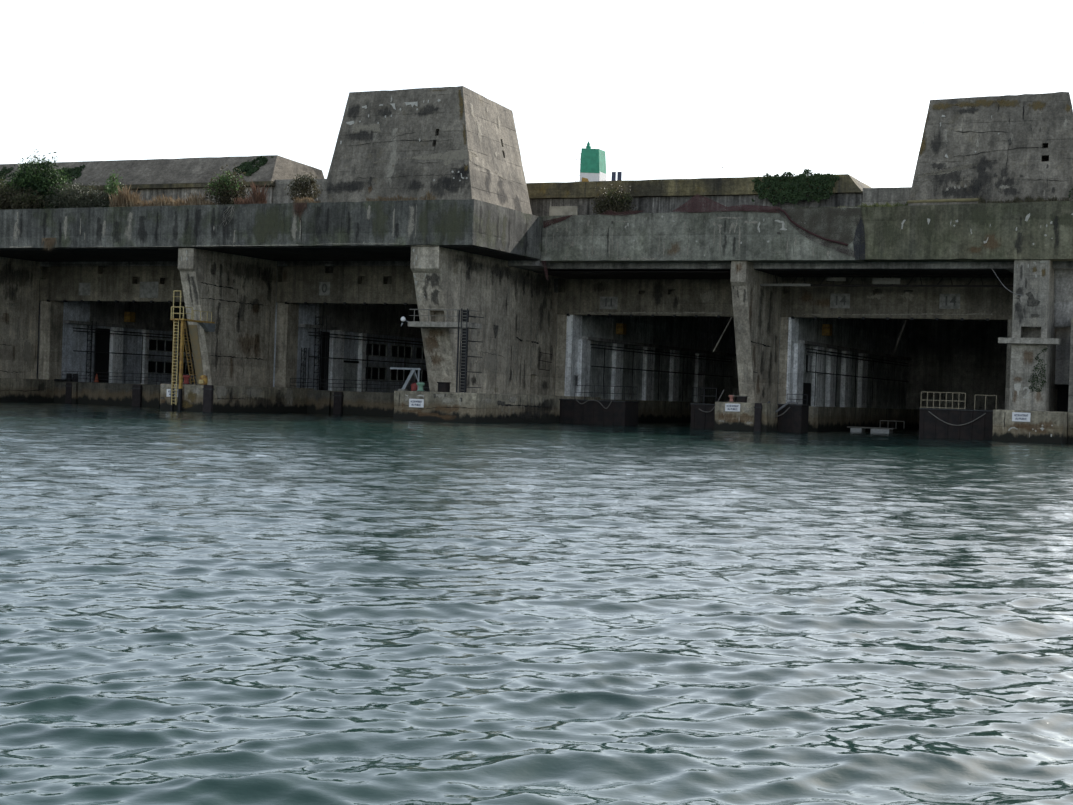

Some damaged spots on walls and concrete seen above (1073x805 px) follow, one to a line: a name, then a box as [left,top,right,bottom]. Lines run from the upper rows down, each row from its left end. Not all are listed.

water stain [327,177,372,193]
water stain [931,130,1023,198]
water stain [80,207,301,247]
water stain [424,274,440,304]
water stain [1013,266,1048,326]
water stain [456,254,553,420]